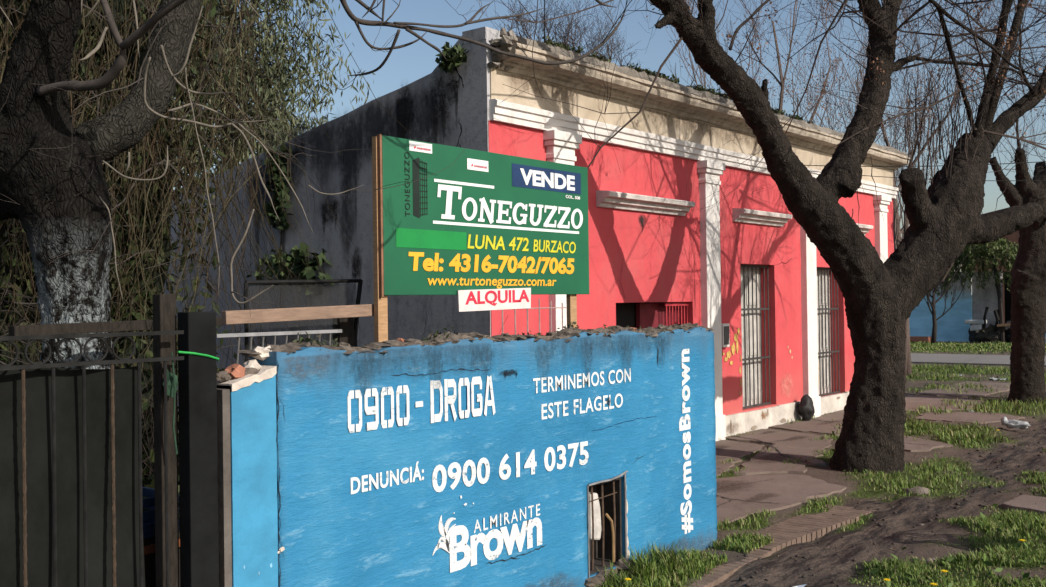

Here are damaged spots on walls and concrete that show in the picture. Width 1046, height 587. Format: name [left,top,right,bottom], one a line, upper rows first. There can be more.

water stain [284,73,460,278]